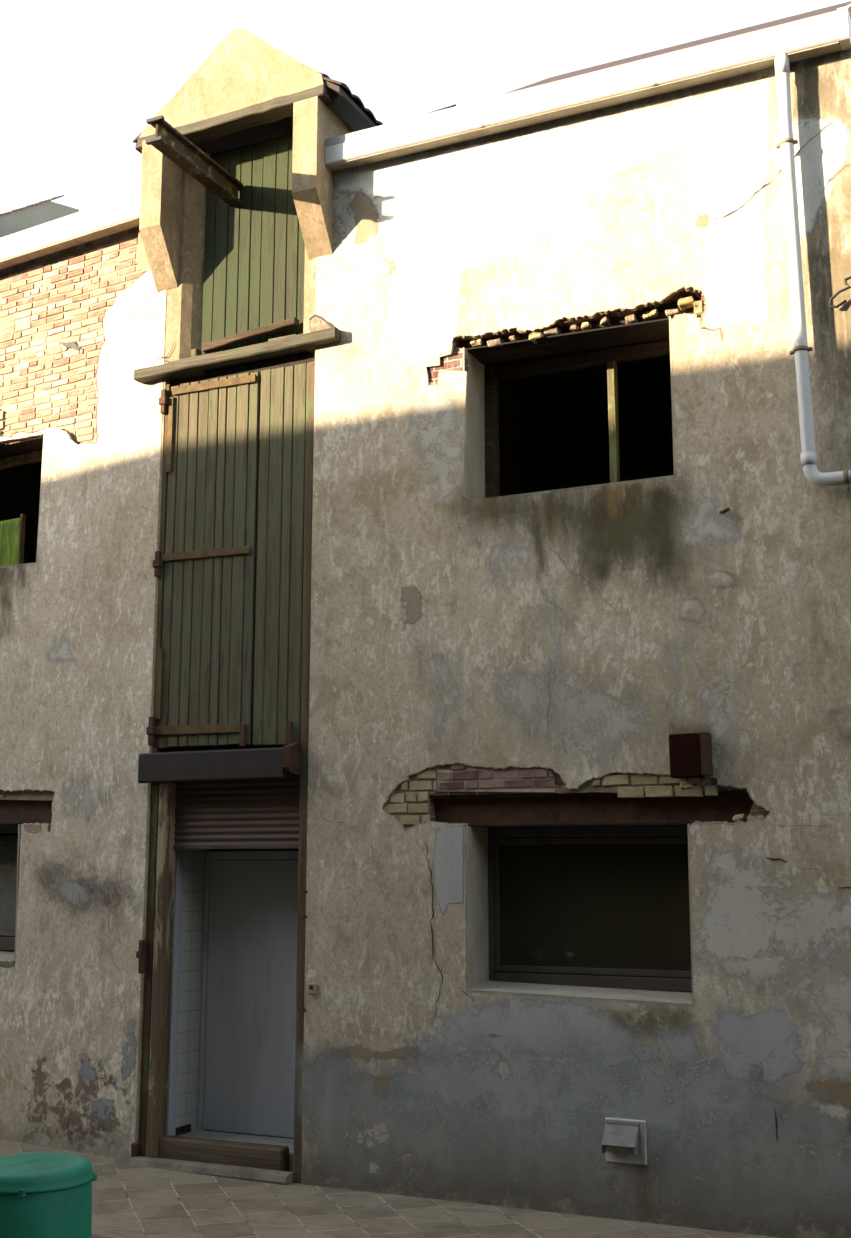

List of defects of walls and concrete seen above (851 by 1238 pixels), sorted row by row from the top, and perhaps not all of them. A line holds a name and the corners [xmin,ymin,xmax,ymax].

spalling [135,230,150,273]
peeling [309,79,771,502]
spalling [0,300,115,445]
damp [465,486,686,578]
spalling [0,779,107,833]
spalling [382,684,770,830]
crack [425,843,475,1017]
peeling [696,850,851,987]
peeling [25,1020,136,1150]
peeling [299,1050,851,1238]